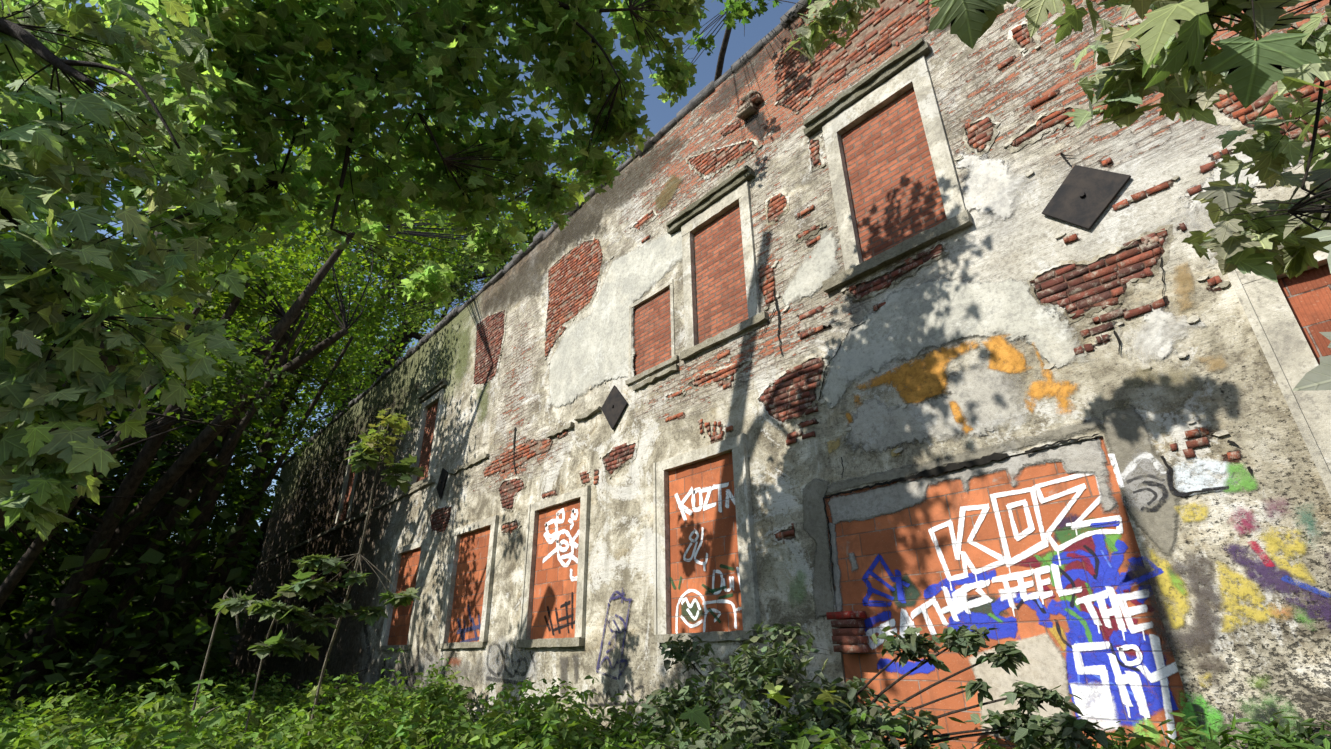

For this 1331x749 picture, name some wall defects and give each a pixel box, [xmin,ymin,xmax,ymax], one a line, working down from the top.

flaking render [774,0,931,115]
flaking render [686,119,763,180]
peeling [954,89,1108,222]
flaking render [1027,77,1331,370]
flaking render [472,309,506,387]
flaking render [545,237,614,360]
crack [760,290,783,355]
flaking render [663,350,753,444]
flaking render [755,353,830,445]
peeling [845,365,1026,453]
flaking render [483,430,568,537]
flaking render [578,440,638,487]